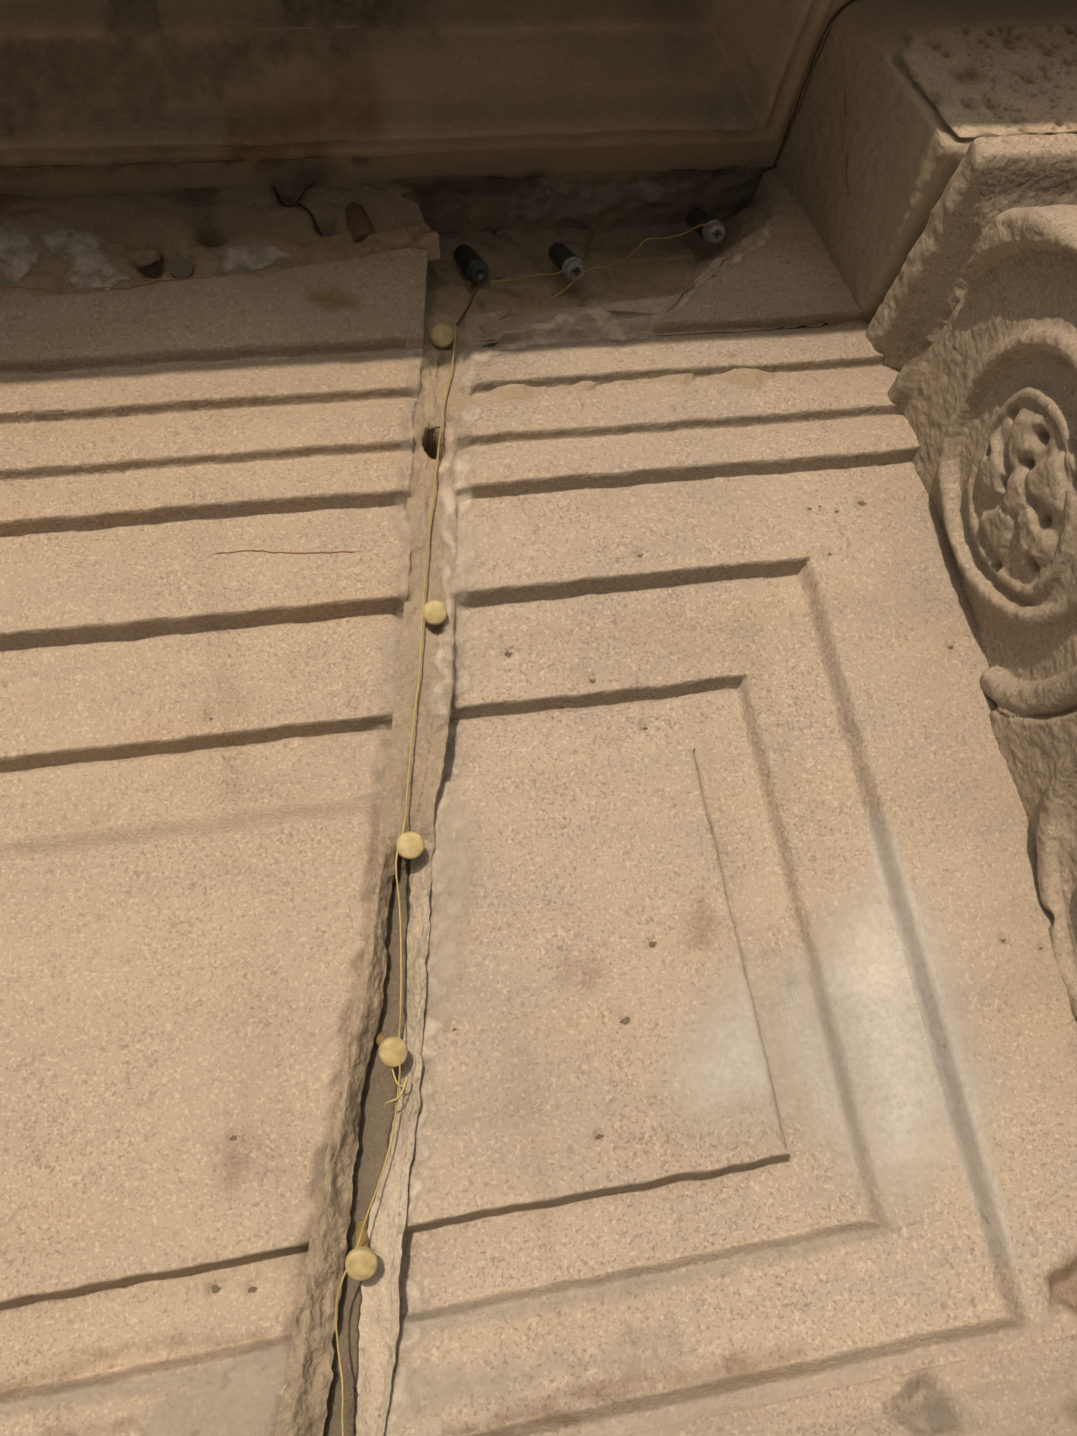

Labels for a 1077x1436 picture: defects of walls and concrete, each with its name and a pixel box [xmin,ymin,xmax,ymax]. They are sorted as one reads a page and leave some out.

spalling [0,182,786,429]
crack [610,251,836,342]
crack [272,305,603,1436]